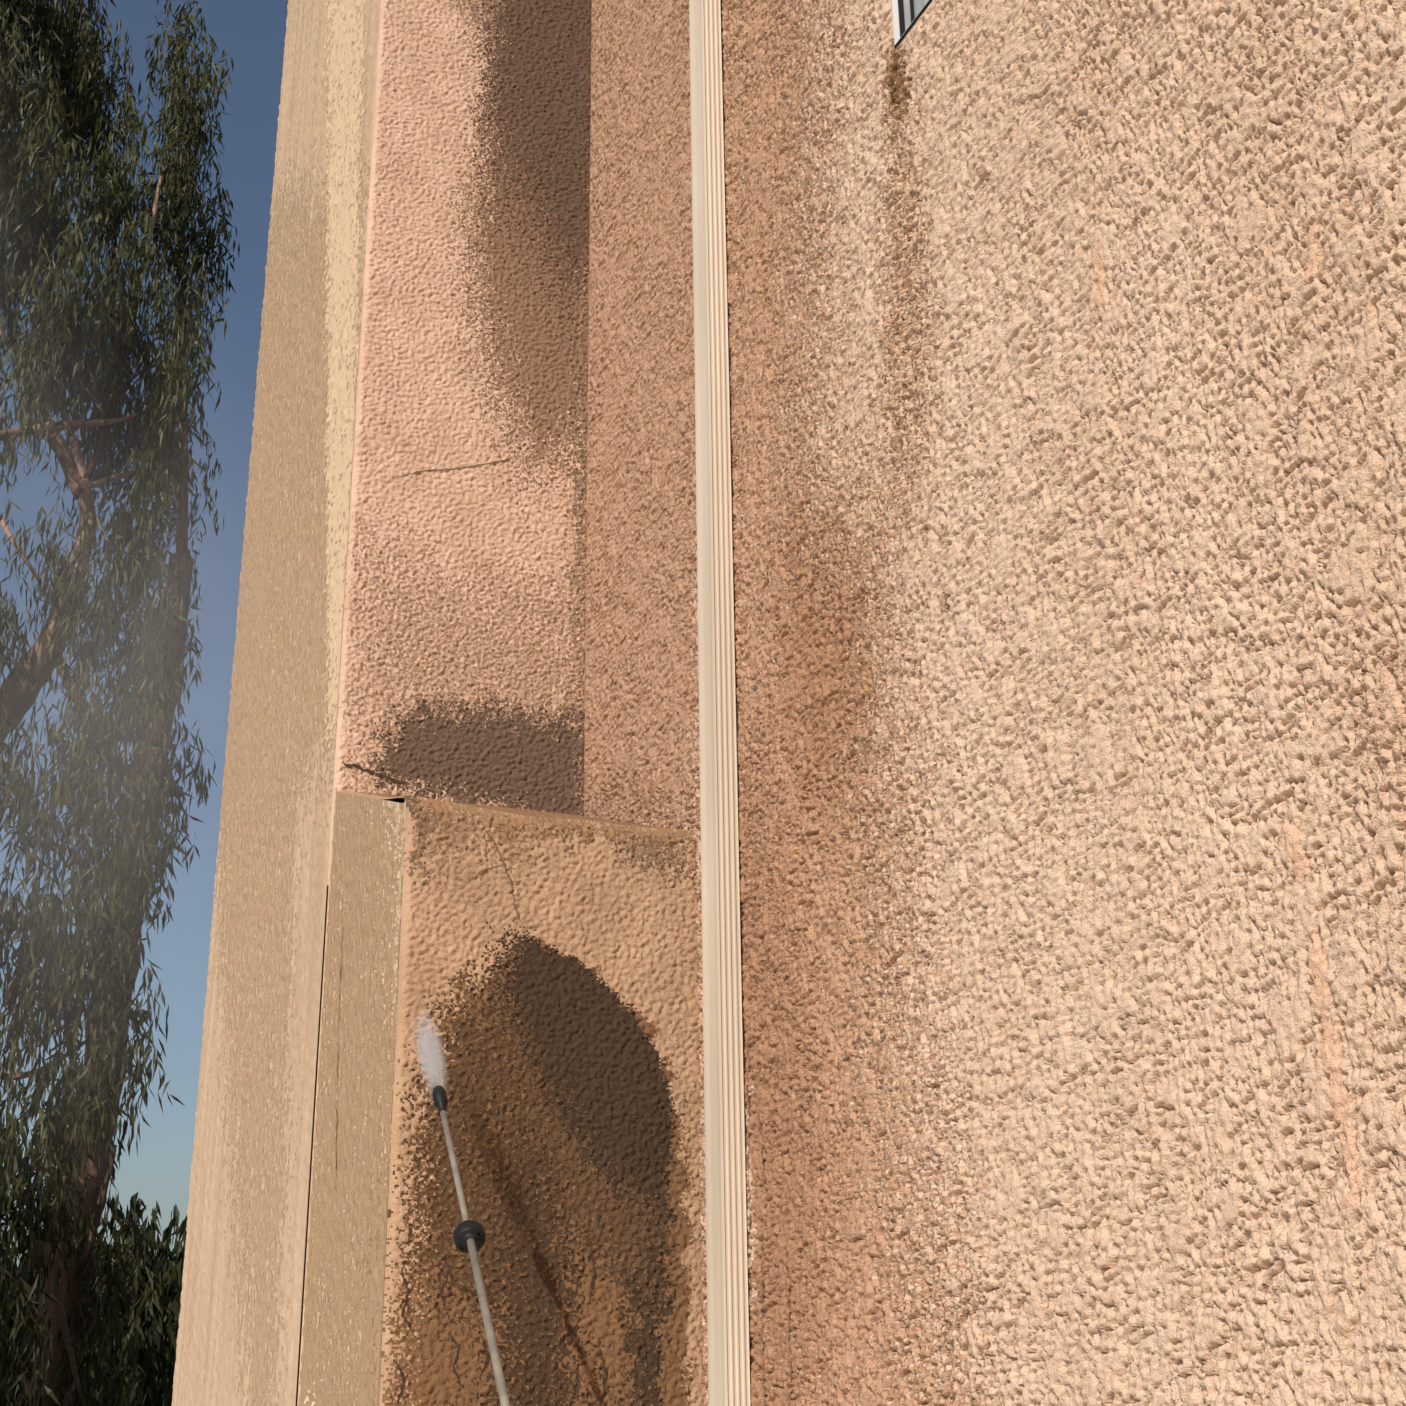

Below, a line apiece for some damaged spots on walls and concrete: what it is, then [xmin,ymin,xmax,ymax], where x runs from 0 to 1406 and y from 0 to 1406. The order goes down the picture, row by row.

leakage [744,1083,759,1315]